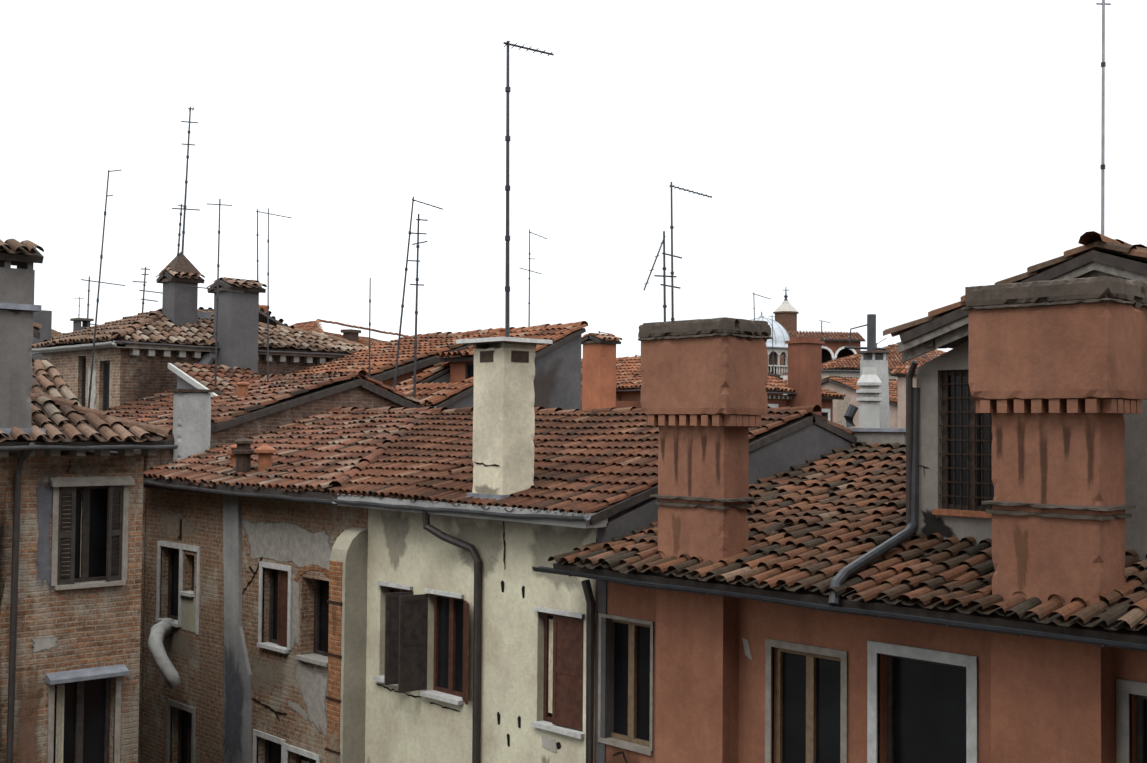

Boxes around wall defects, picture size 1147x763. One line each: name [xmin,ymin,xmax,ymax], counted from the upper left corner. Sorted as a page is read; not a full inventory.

flaking render [241,520,332,737]